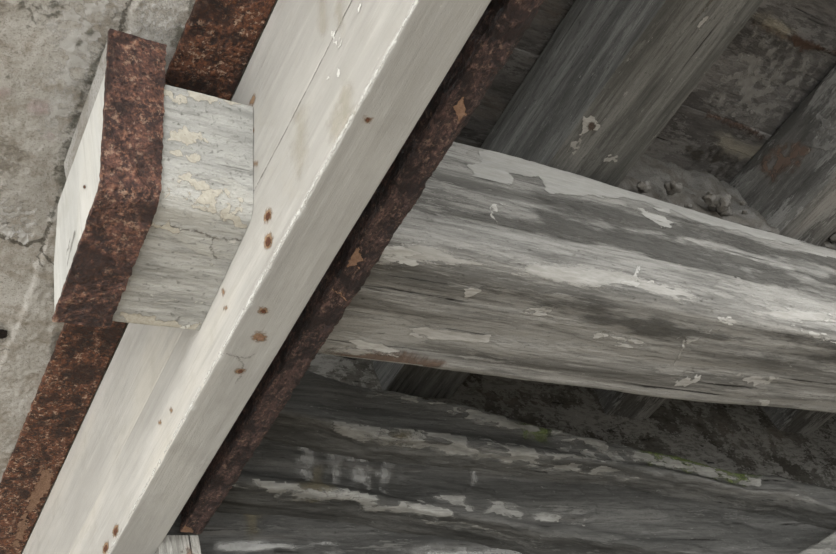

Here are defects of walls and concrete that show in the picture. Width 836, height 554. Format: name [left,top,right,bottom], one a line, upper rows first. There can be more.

corrosion [453,97,467,121]
corrosion [579,116,600,136]
peeling [442,150,836,293]
crack [0,222,54,267]
corrosion [347,247,363,269]
peeling [377,243,486,266]
peeling [464,287,482,298]
peeling [511,263,696,302]
peeling [525,301,737,364]
peeling [748,295,836,363]
peeling [674,374,701,387]
corrosion [10,467,54,547]